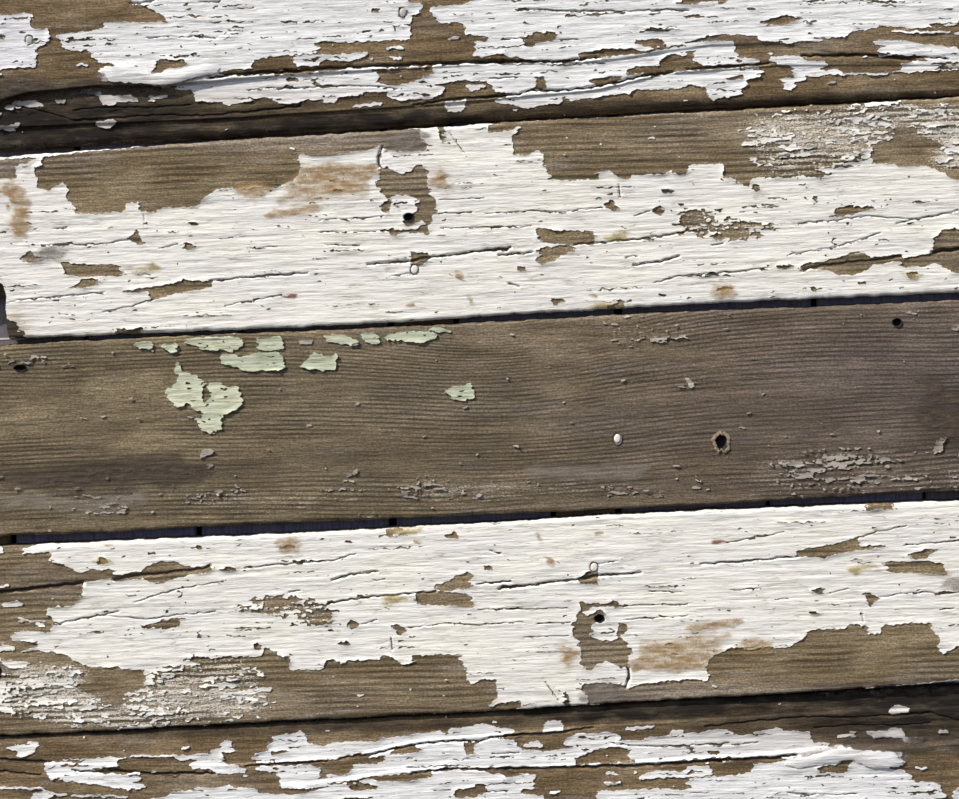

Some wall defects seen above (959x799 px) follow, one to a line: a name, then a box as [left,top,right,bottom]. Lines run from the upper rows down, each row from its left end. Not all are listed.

peeling [0,0,959,236]
peeling [60,262,126,289]
peeling [123,279,213,302]
peeling [535,228,597,265]
peeling [670,208,776,242]
peeling [800,227,959,276]
crack [704,532,791,566]
peeling [795,536,886,559]
crack [61,566,216,624]
crack [248,554,434,624]
crack [461,561,687,638]
peeling [0,545,959,799]